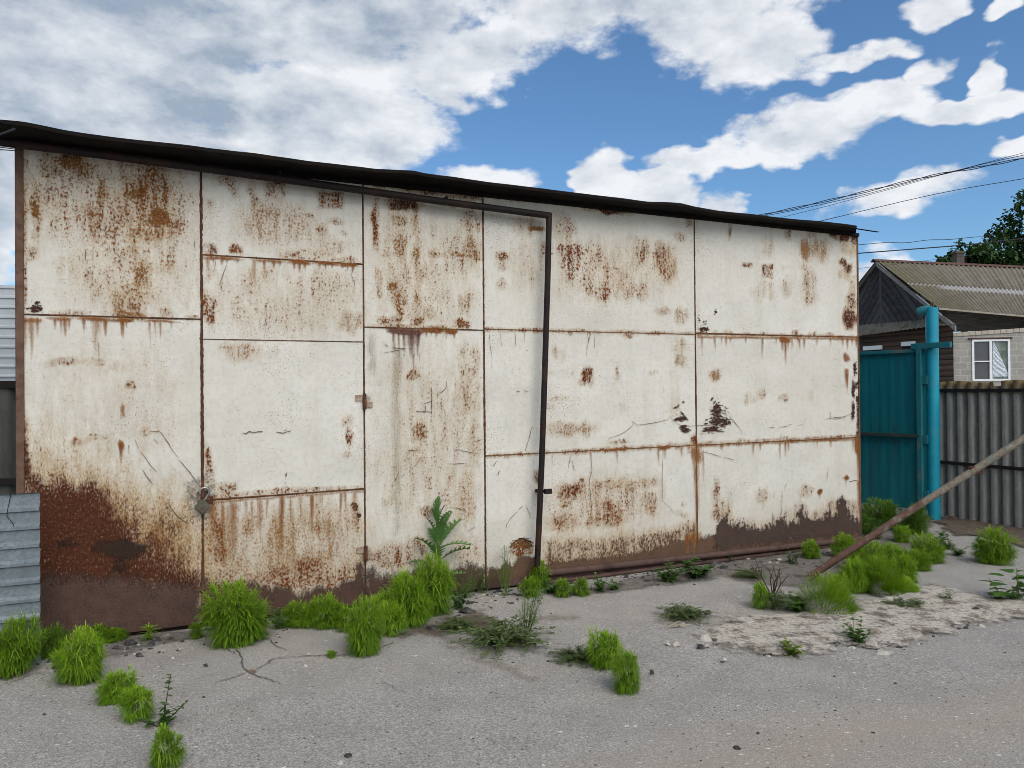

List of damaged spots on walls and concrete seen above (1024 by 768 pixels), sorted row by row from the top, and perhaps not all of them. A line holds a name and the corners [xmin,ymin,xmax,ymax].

corrosion [23,154,364,359]
corrosion [371,186,482,520]
corrosion [496,212,678,303]
peeling [674,398,731,435]
corrosion [617,229,858,385]
corrosion [24,418,861,643]
crack [217,640,352,684]